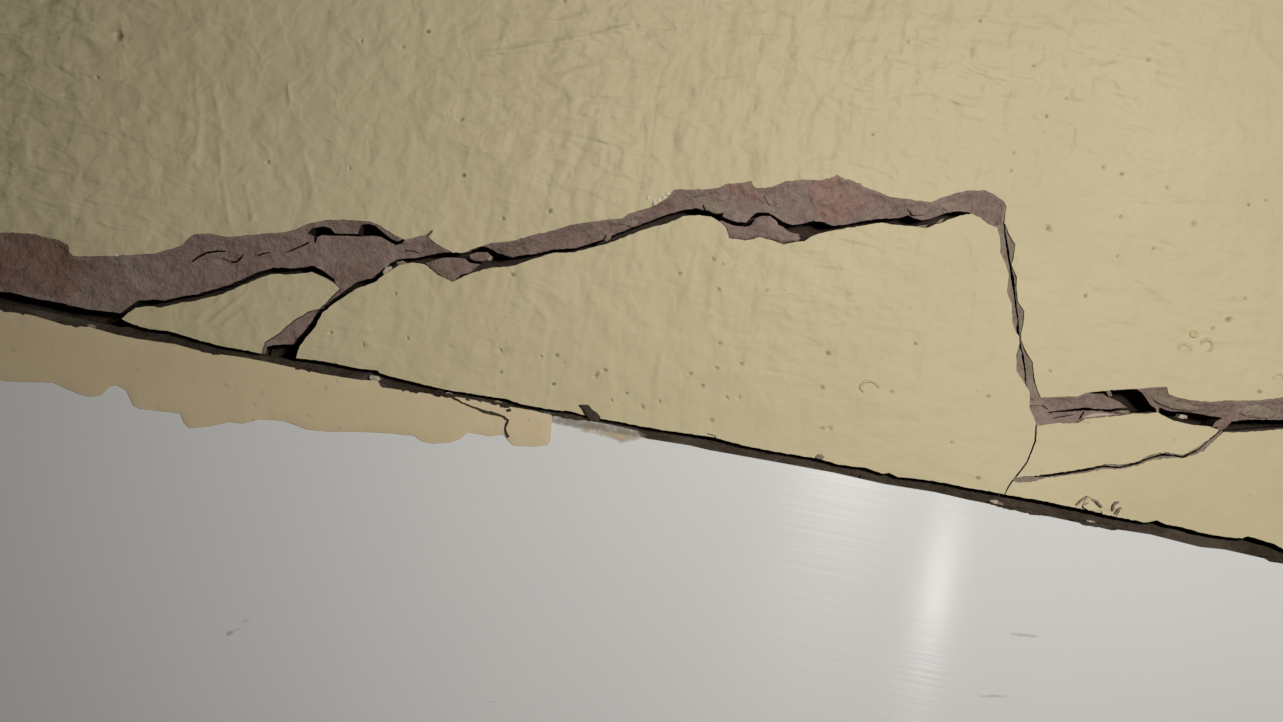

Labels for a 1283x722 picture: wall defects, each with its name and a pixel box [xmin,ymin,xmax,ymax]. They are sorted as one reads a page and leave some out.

peeling [0,175,1006,446]
crack [0,302,1283,564]
crack [994,224,1045,405]
flaking render [1016,387,1283,478]